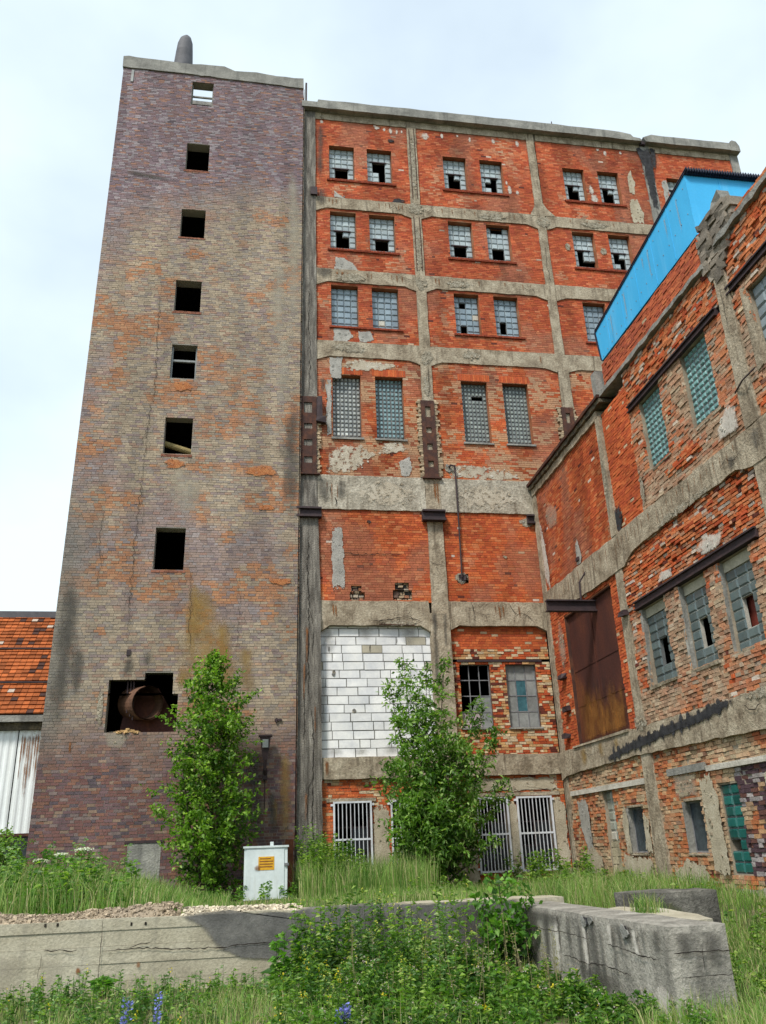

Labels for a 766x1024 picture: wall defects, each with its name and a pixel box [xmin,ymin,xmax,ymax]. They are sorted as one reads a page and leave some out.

peeling [627,170,644,224]
damp [636,147,659,215]
peeling [316,328,518,511]
peeling [718,406,738,441]
peeling [696,532,721,553]
damp [57,593,80,698]
damp [612,698,721,762]
crack [37,923,313,987]